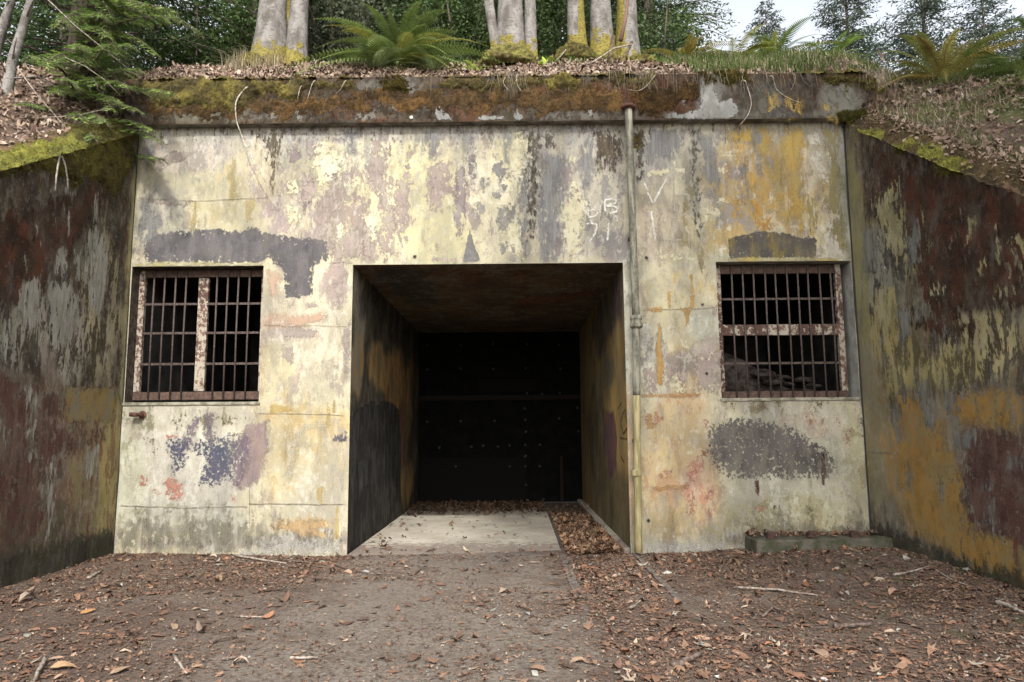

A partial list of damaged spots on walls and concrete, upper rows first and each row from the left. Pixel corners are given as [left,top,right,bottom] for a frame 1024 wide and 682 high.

spalling [435,106,452,120]
peeling [275,109,526,364]
peeling [554,156,592,260]
leakage [0,507,339,589]